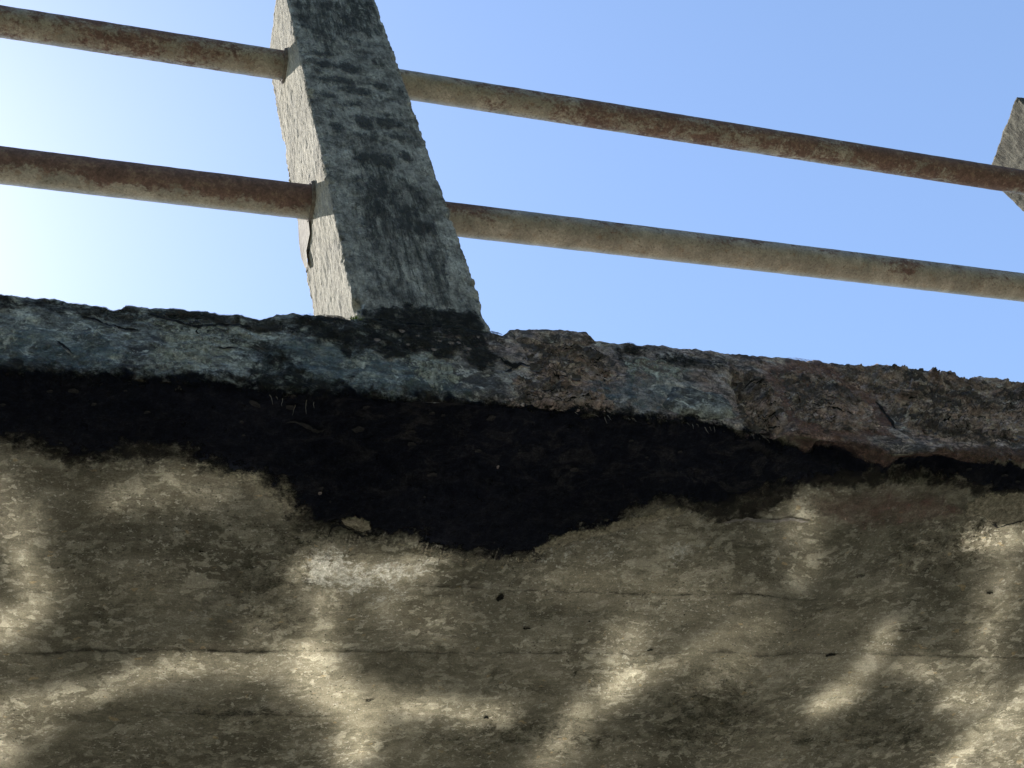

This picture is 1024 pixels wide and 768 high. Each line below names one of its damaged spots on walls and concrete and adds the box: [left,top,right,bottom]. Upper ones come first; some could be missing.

water stain [0,366,1024,633]